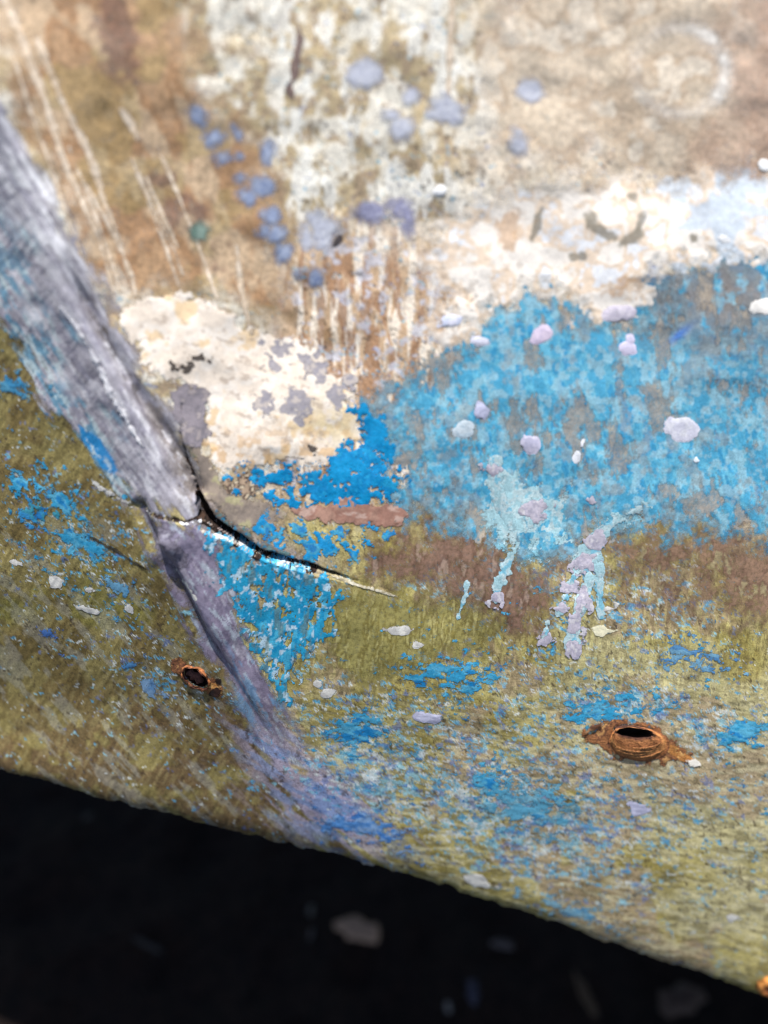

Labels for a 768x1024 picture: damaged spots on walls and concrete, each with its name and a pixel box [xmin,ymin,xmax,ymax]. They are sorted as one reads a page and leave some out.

crack [147,406,395,597]
peeling [119,166,768,944]
rust [171,657,223,697]
rust [582,718,693,767]